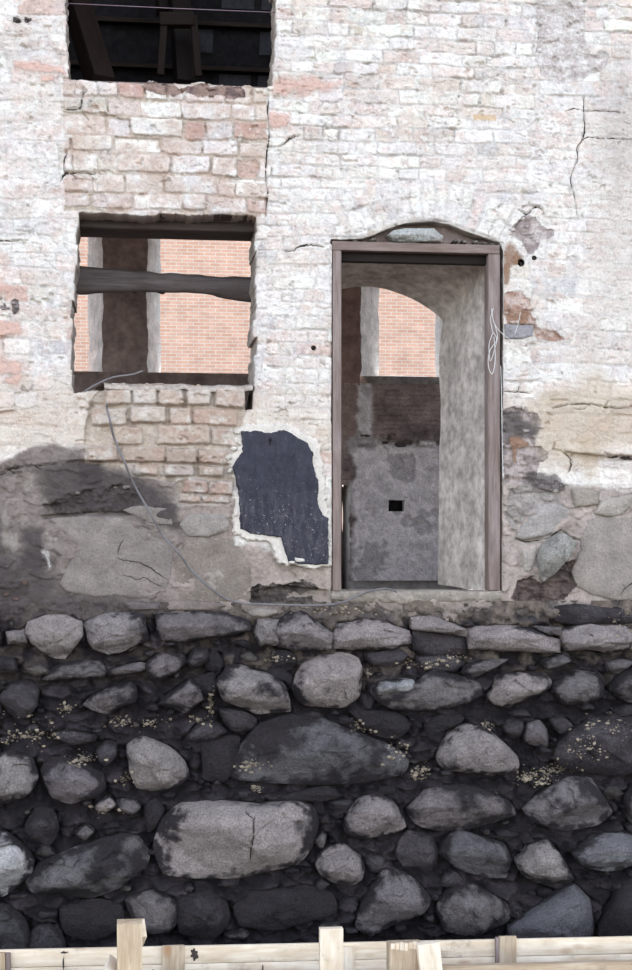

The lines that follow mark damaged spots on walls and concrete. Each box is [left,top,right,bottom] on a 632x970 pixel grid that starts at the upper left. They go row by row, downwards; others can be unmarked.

crack [570,101,629,217]
spalling [509,215,555,254]
spalling [503,291,565,341]
spalling [42,491,140,516]
leakage [157,506,177,528]
flaking render [341,383,441,581]
spalling [502,405,564,530]
spalling [511,559,577,601]